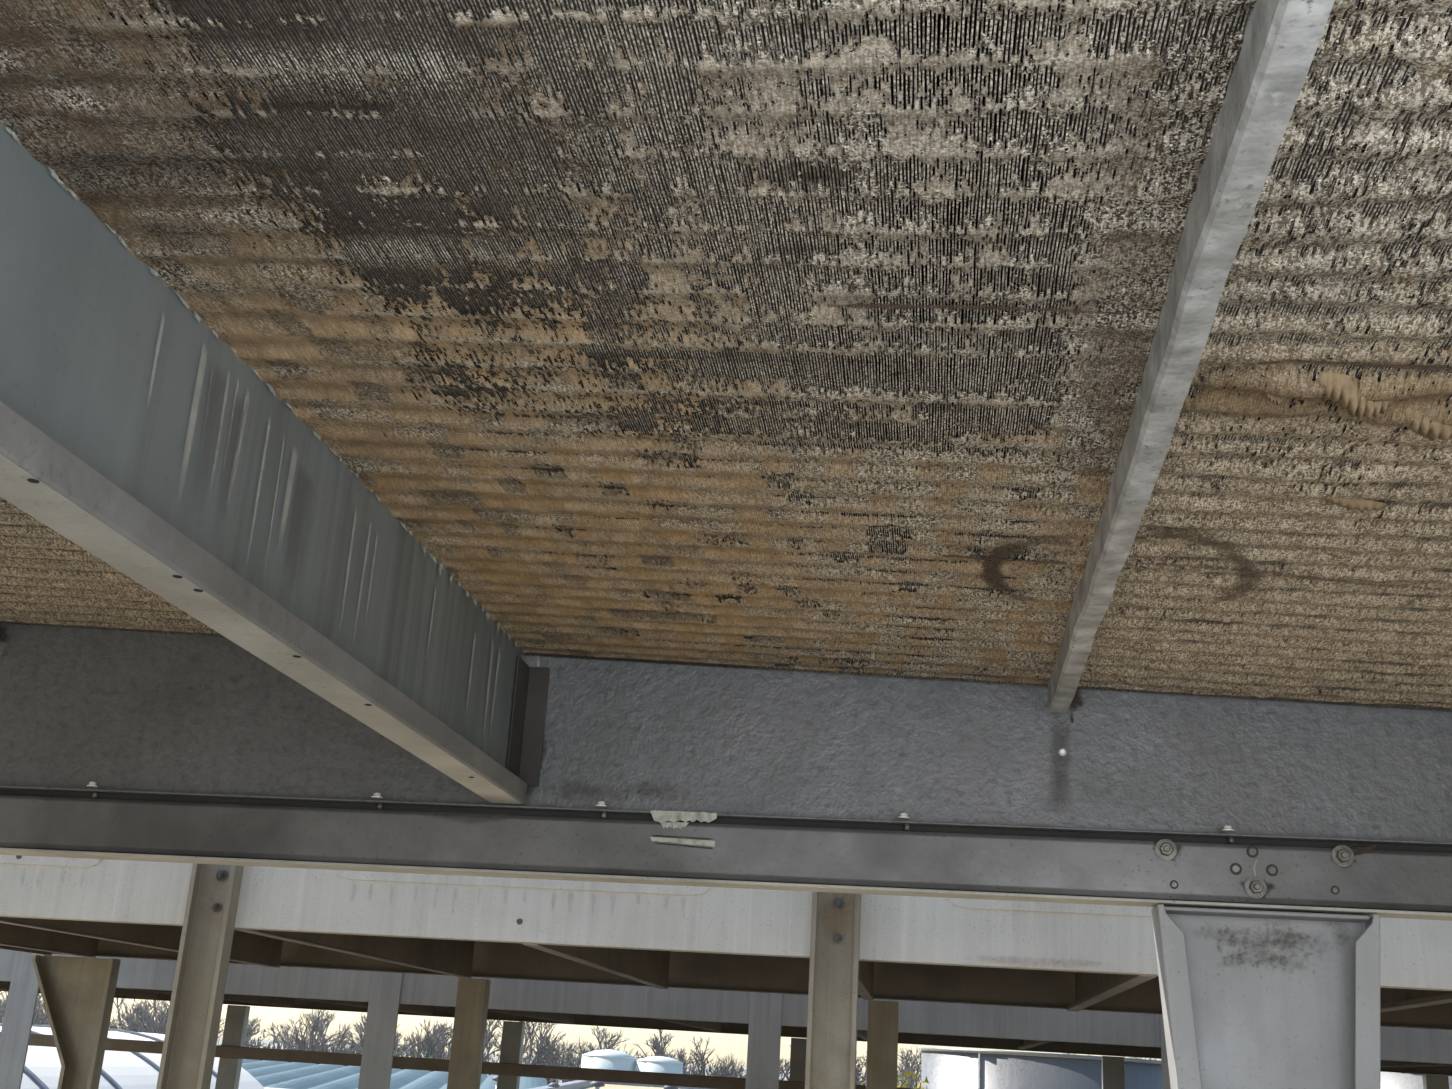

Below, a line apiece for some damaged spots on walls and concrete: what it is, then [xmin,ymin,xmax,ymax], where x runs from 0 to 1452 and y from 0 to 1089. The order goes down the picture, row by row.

leakage [49,167,79,199]
leakage [151,318,164,386]
leakage [185,351,248,486]
leakage [253,423,297,534]
leakage [939,539,1066,601]
leakage [1134,529,1439,604]